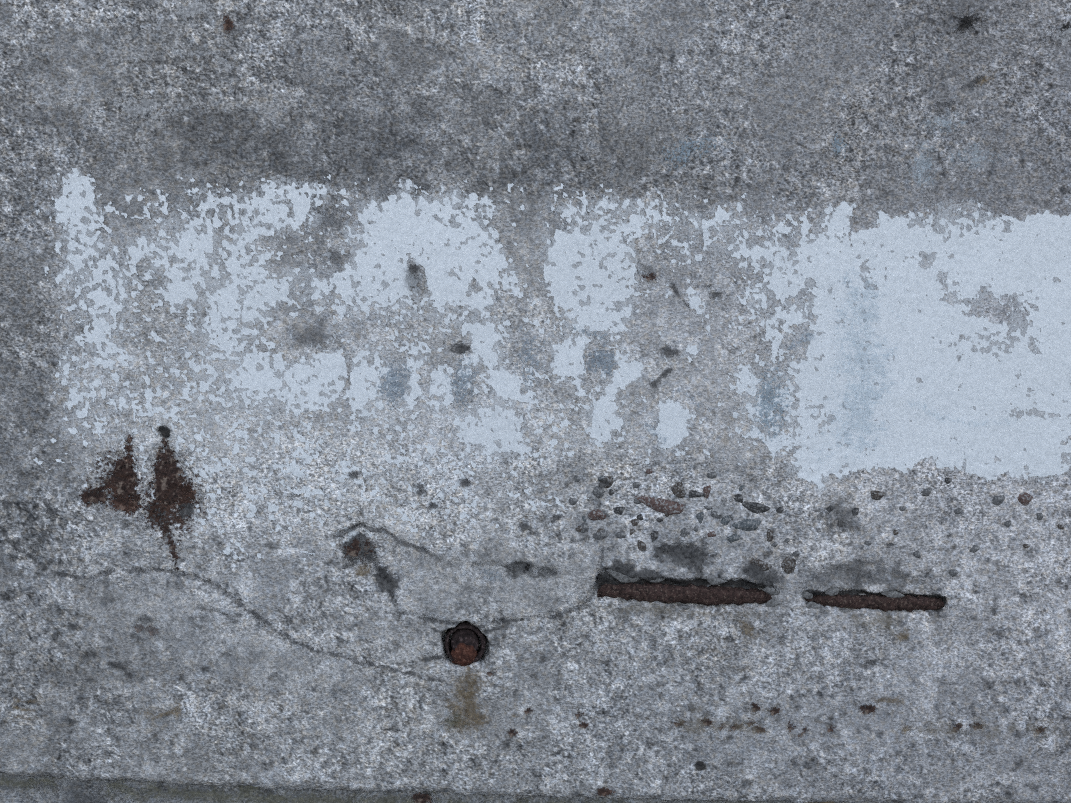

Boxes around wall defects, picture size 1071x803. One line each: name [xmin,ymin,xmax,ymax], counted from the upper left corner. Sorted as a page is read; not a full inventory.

peeling [36,168,1071,613]
corrosion [79,425,210,570]
crack [0,498,604,683]